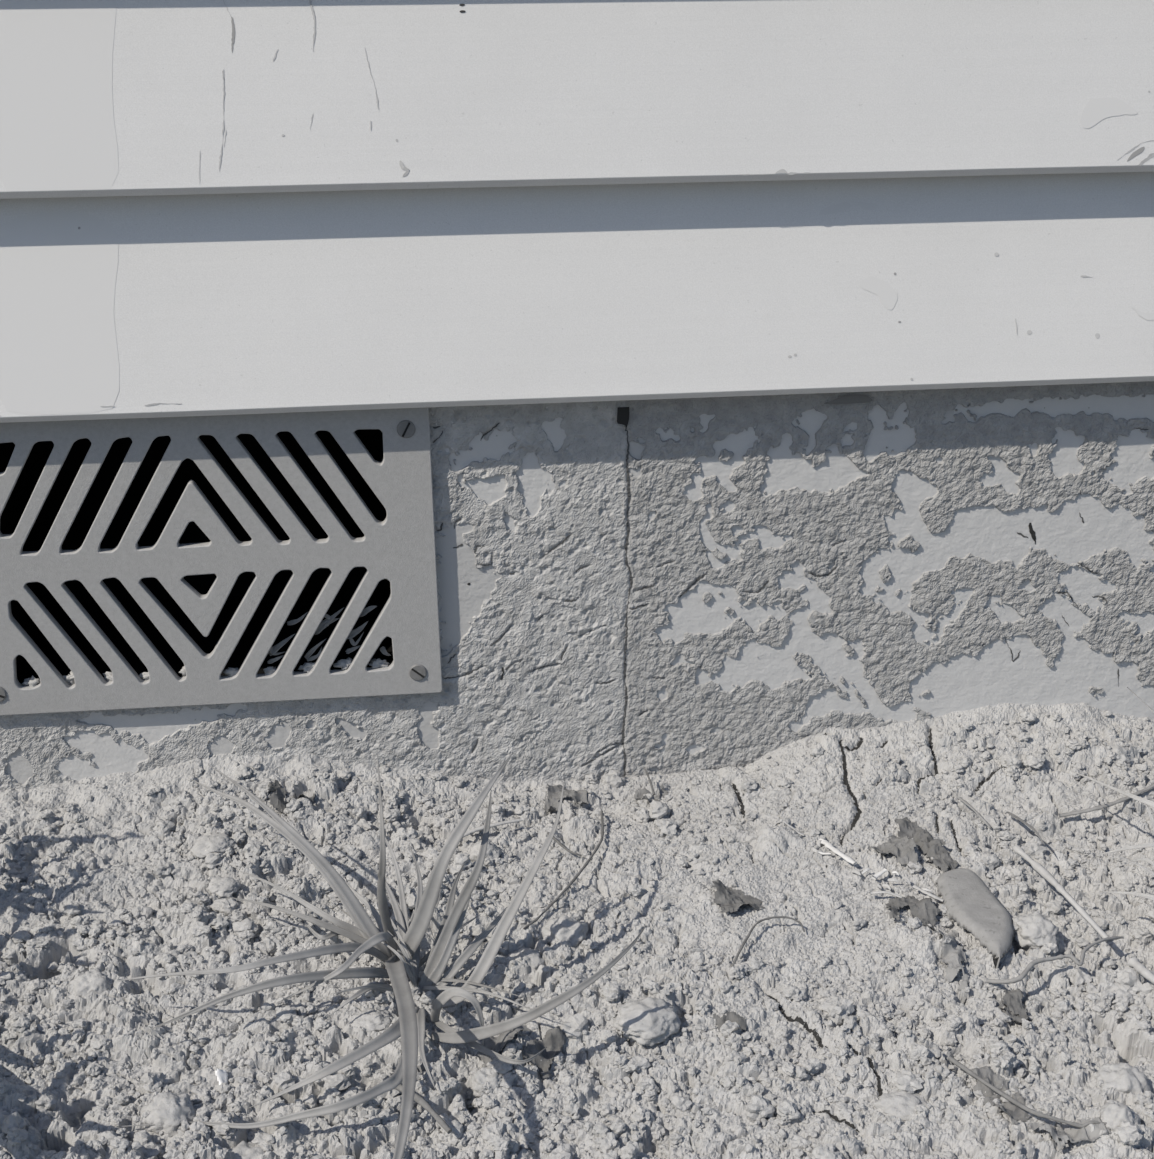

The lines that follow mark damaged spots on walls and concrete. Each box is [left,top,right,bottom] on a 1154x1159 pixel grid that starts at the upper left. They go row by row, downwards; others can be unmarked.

spalling [440,421,566,530]
spalling [617,407,629,427]
spalling [435,523,513,656]
crack [437,426,707,777]
spalling [649,394,1154,732]
spalling [55,703,247,782]